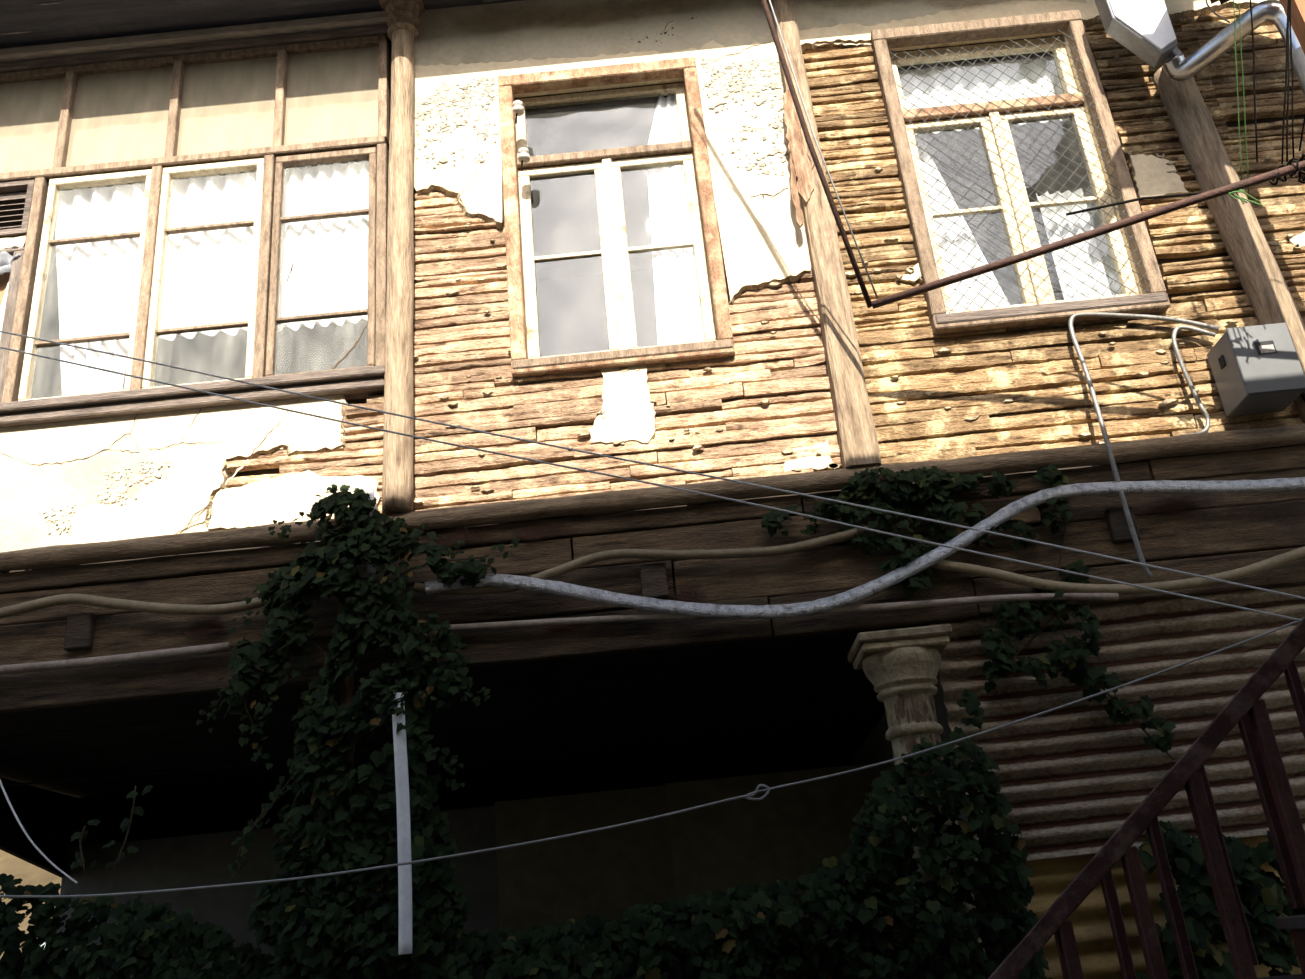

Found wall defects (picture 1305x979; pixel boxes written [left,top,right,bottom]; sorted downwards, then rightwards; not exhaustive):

peeling [414,73,503,168]
spalling [701,15,1305,464]
spalling [413,184,842,512]
peeling [0,449,177,553]
crack [0,399,300,534]
spalling [205,395,384,531]